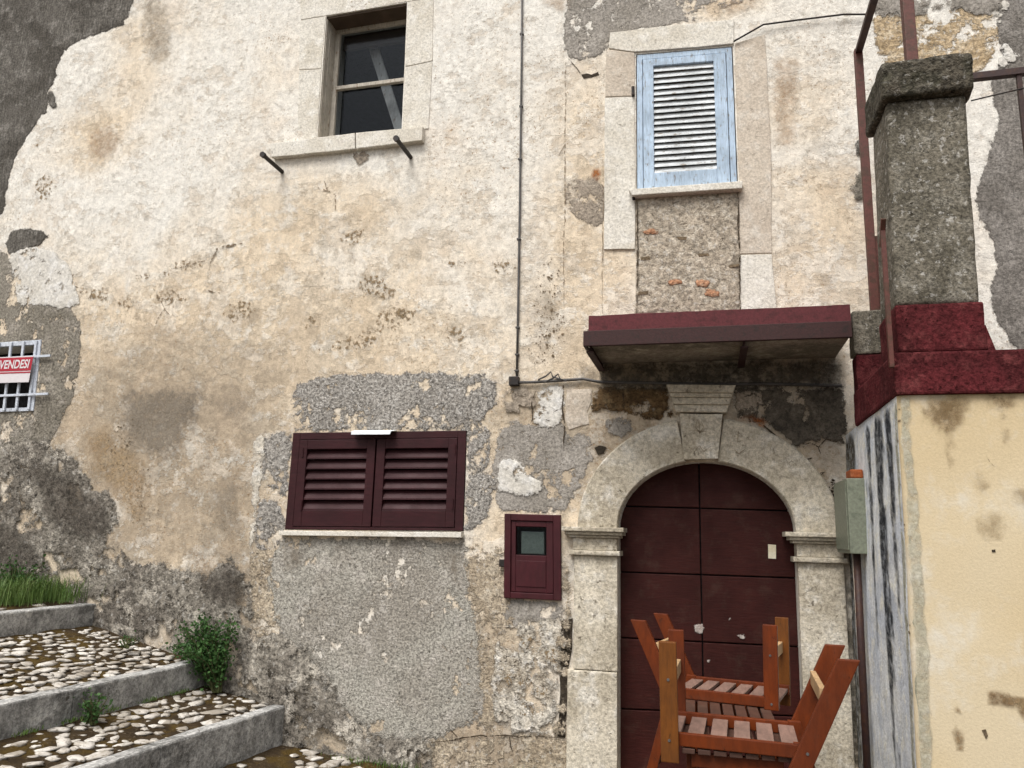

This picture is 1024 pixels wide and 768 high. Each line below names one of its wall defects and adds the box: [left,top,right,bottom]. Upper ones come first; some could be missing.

flaking render [563,0,751,61]
flaking render [872,12,904,63]
flaking render [0,0,133,214]
flaking render [915,0,1024,349]
flaking render [0,228,81,445]
water stain [29,462,107,538]
flaking render [491,386,673,513]
water stain [200,570,244,604]
water stain [866,411,900,750]